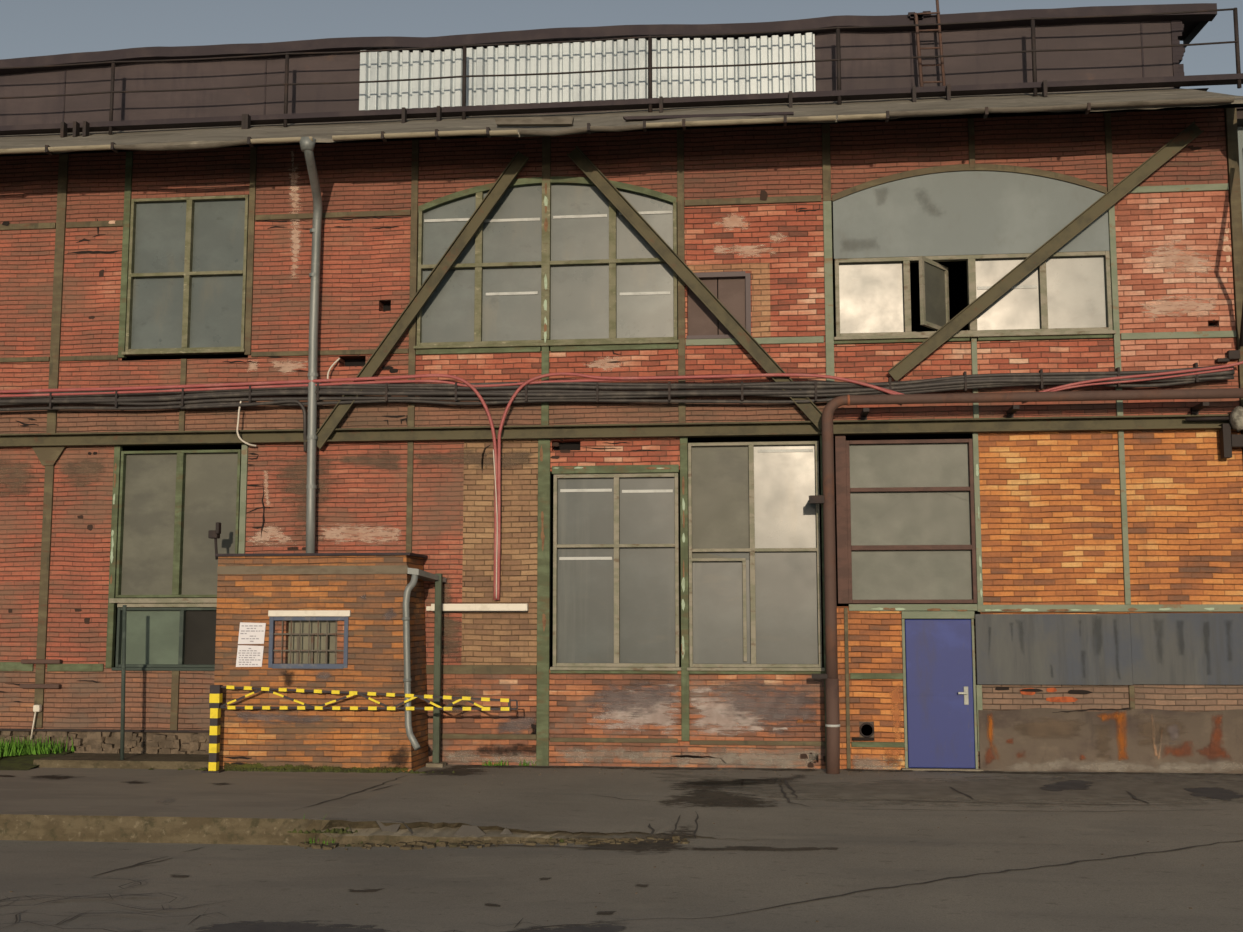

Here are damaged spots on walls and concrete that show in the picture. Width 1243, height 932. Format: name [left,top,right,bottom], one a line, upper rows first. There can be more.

damp [287,151,301,276]
damp [589,682,815,733]
corrosion [1097,712,1127,760]
corrosion [1166,717,1226,759]
damp [566,750,815,808]
damp [578,825,837,853]
crack [0,847,231,932]
crack [445,840,1243,932]